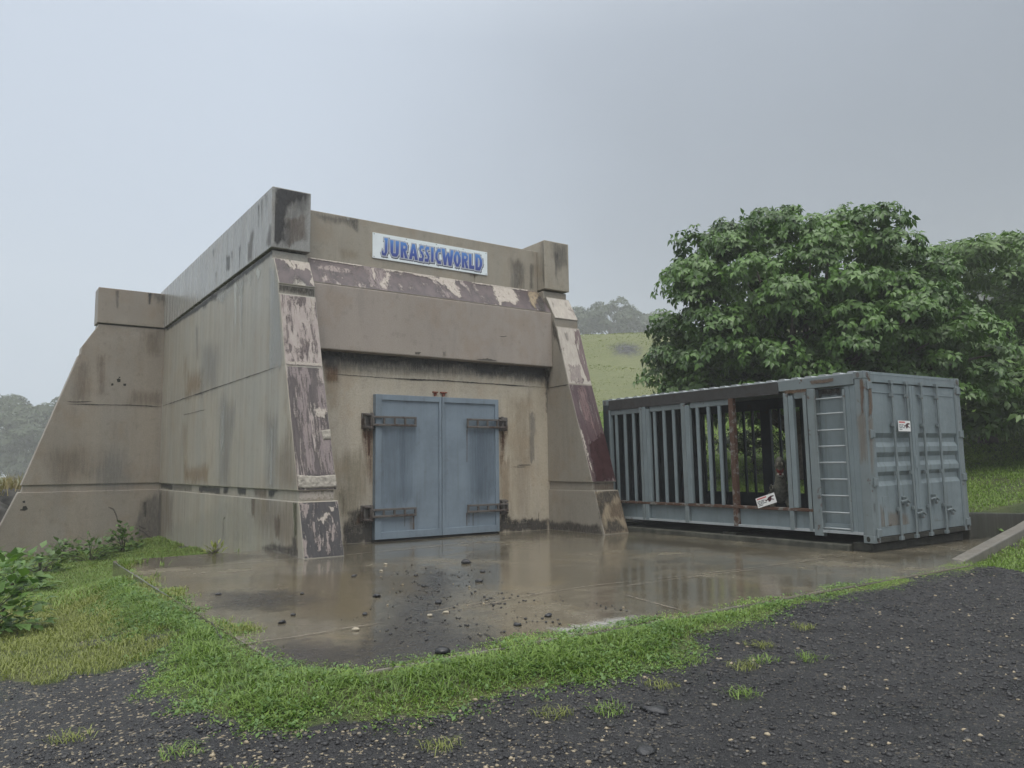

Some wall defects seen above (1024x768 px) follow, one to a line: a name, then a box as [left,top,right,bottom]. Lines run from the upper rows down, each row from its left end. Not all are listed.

water stain [167,189,307,330]
peeling [275,258,628,558]
corrosion [363,429,373,469]
water stain [343,510,372,544]
water stain [500,495,602,534]